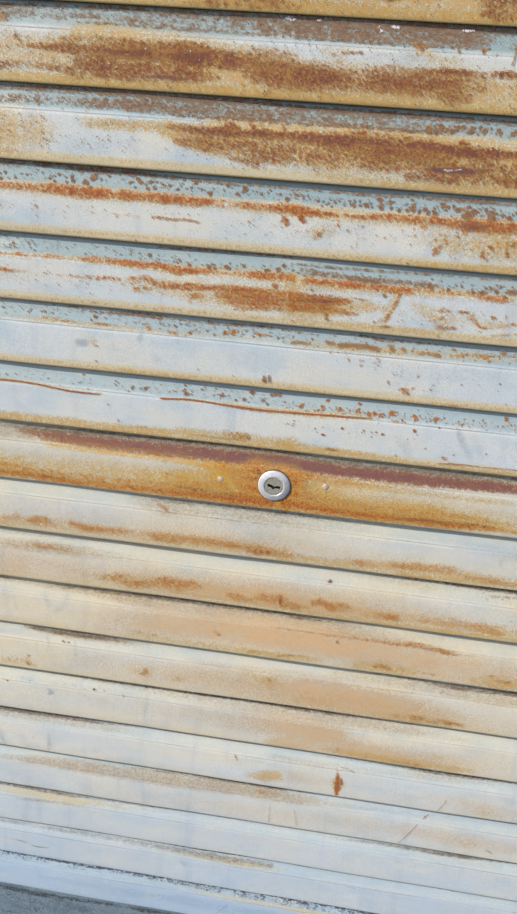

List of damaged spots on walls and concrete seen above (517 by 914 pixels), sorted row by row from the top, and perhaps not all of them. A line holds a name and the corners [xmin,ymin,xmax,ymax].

corrosion [0,0,517,375]
corrosion [59,360,515,440]
corrosion [0,412,517,534]
corrosion [333,771,343,795]